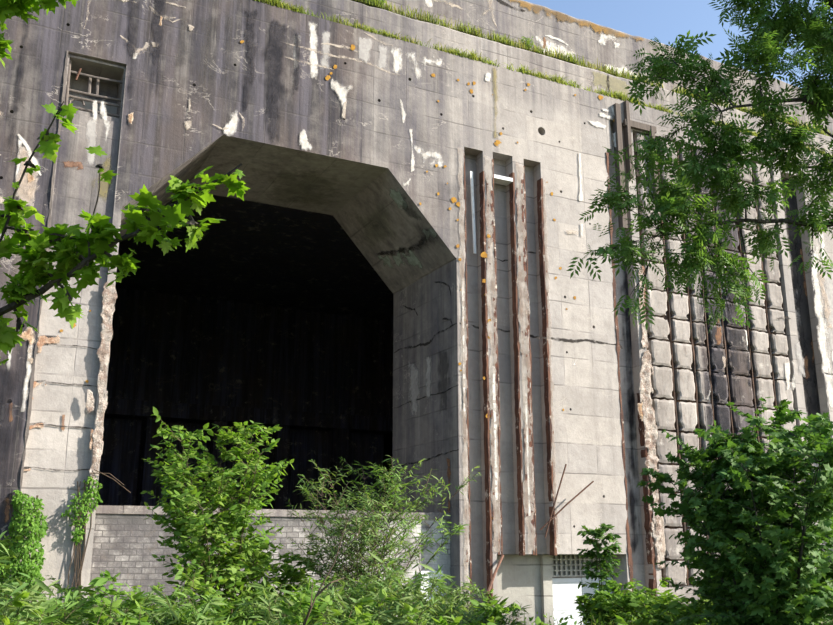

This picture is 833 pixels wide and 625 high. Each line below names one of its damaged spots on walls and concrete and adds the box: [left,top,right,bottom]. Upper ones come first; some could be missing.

damp [243,10,300,139]
damp [309,23,330,77]
crack [377,229,437,268]
damp [0,350,16,499]
spalling [86,282,117,484]
crack [394,318,479,353]
crack [530,335,623,349]
spalling [638,266,666,569]